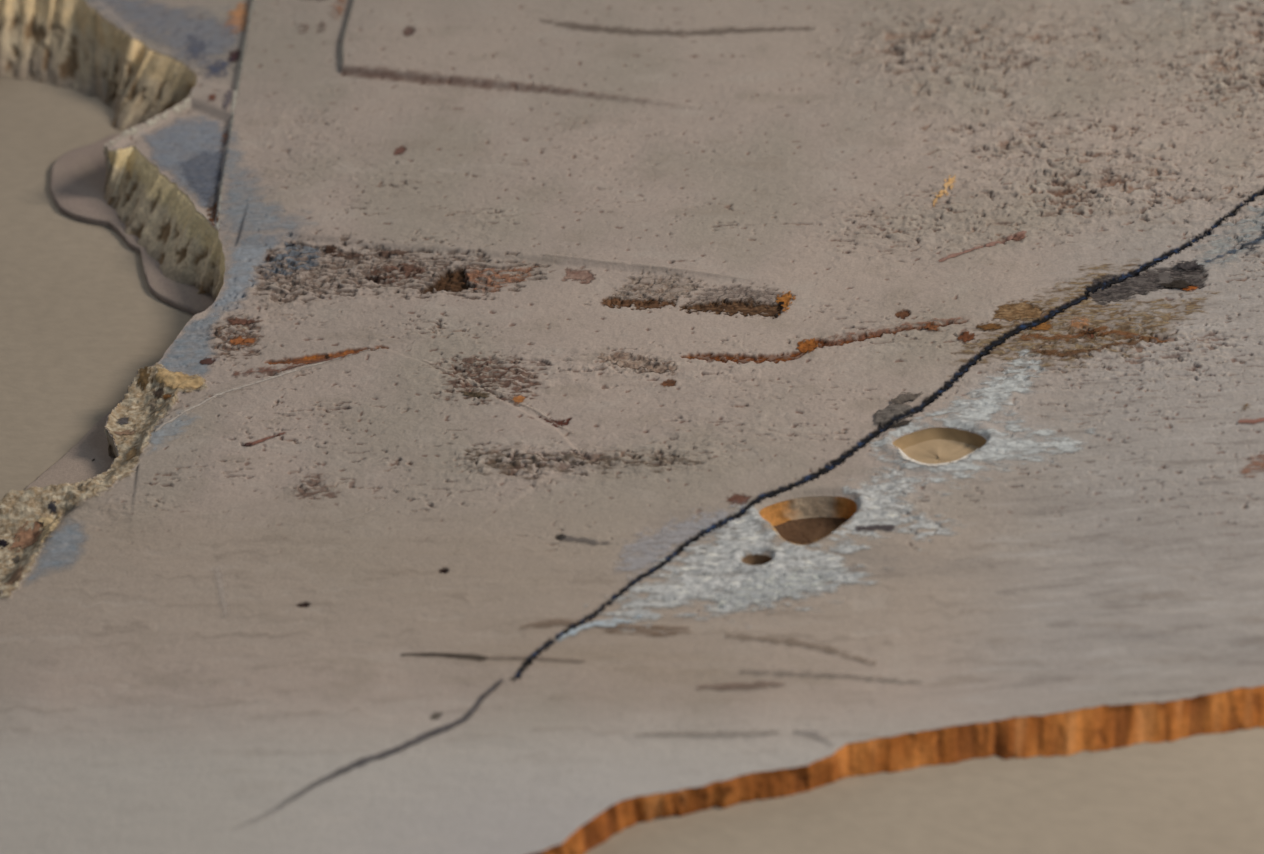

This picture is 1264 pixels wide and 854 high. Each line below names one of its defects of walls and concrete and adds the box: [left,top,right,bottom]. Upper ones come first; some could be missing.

rust [960,264,1217,368]
crack [318,188,1264,783]
water stain [527,349,1095,640]
water stain [698,656,912,689]